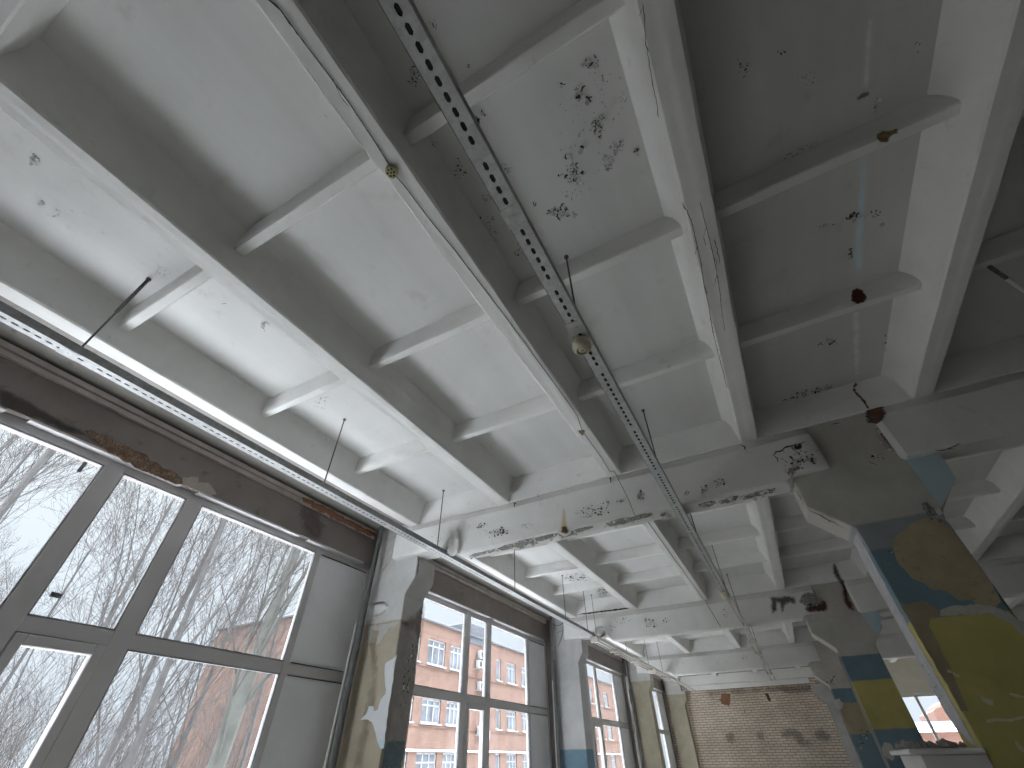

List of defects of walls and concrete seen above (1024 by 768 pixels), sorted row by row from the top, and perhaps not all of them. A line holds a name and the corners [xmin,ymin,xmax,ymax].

crack [639,3,659,117]
peeling [546,54,640,220]
corrosion [877,129,898,142]
crack [681,202,727,387]
corrosion [851,288,867,304]
corrosion [853,383,886,424]
flaking render [86,430,182,484]
corrosion [558,506,571,537]
spalling [470,498,672,559]
spalling [684,478,775,509]
flaking render [854,502,1001,747]
peeling [361,623,421,748]